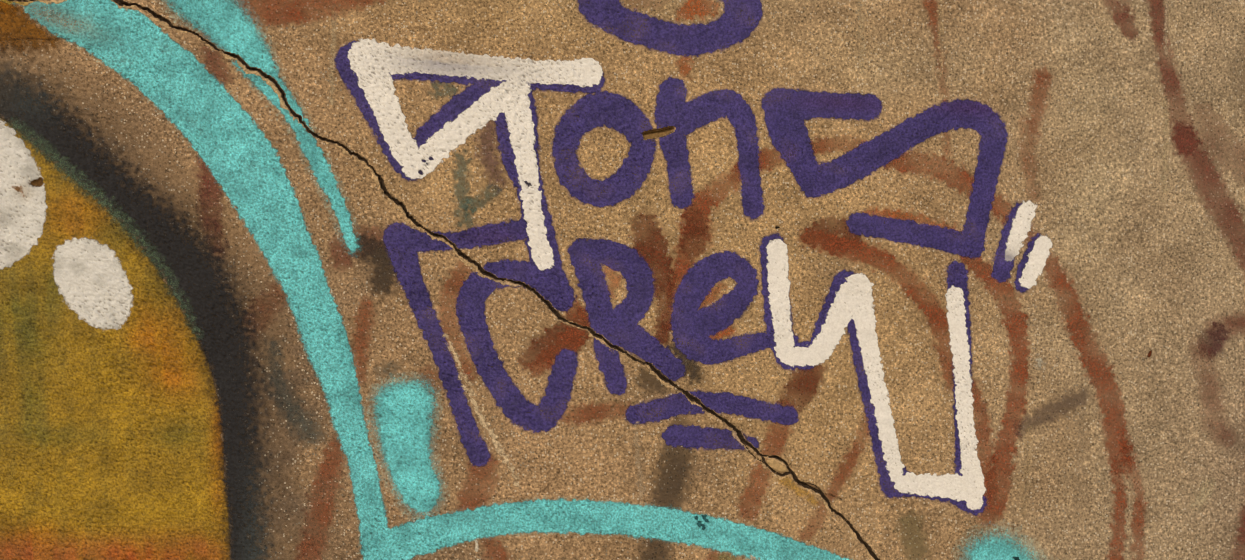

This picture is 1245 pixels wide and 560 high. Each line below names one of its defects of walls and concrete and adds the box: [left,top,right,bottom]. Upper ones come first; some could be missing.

crack [0,0,67,8]
crack [113,0,880,560]